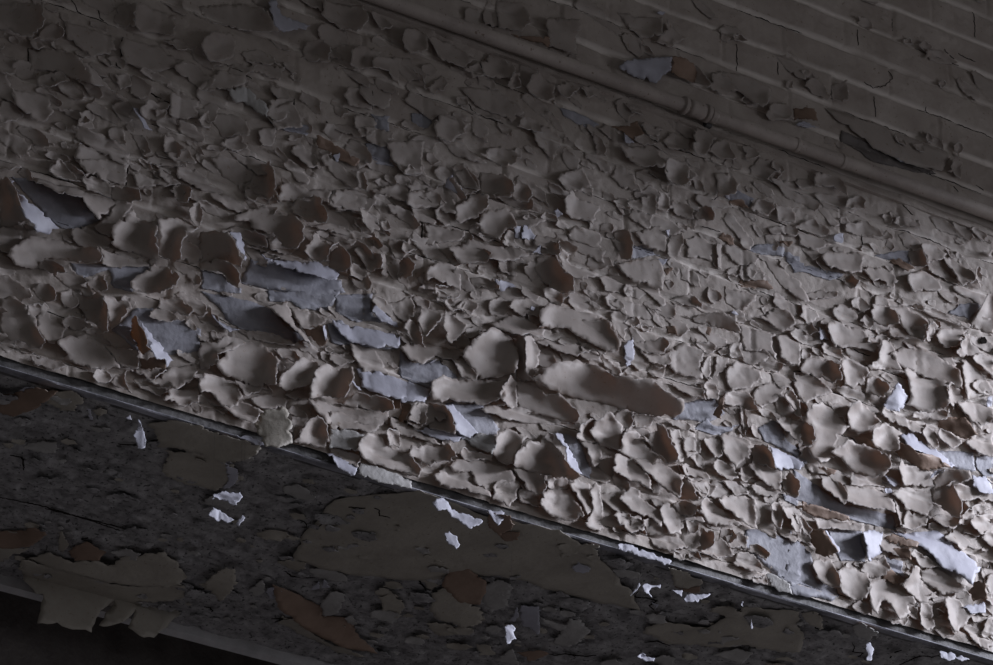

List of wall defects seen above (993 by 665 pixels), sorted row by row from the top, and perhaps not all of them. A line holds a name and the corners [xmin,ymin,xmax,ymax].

crack [846,71,907,136]
peeling [585,118,757,306]
crack [887,204,948,249]
peeling [868,232,988,320]
peeling [320,323,390,376]
peeling [535,337,647,380]
peeling [789,294,993,389]
peeling [871,422,905,452]
peeling [898,358,993,502]
peeling [0,513,286,638]
peeling [256,488,850,665]
peeling [968,559,993,606]